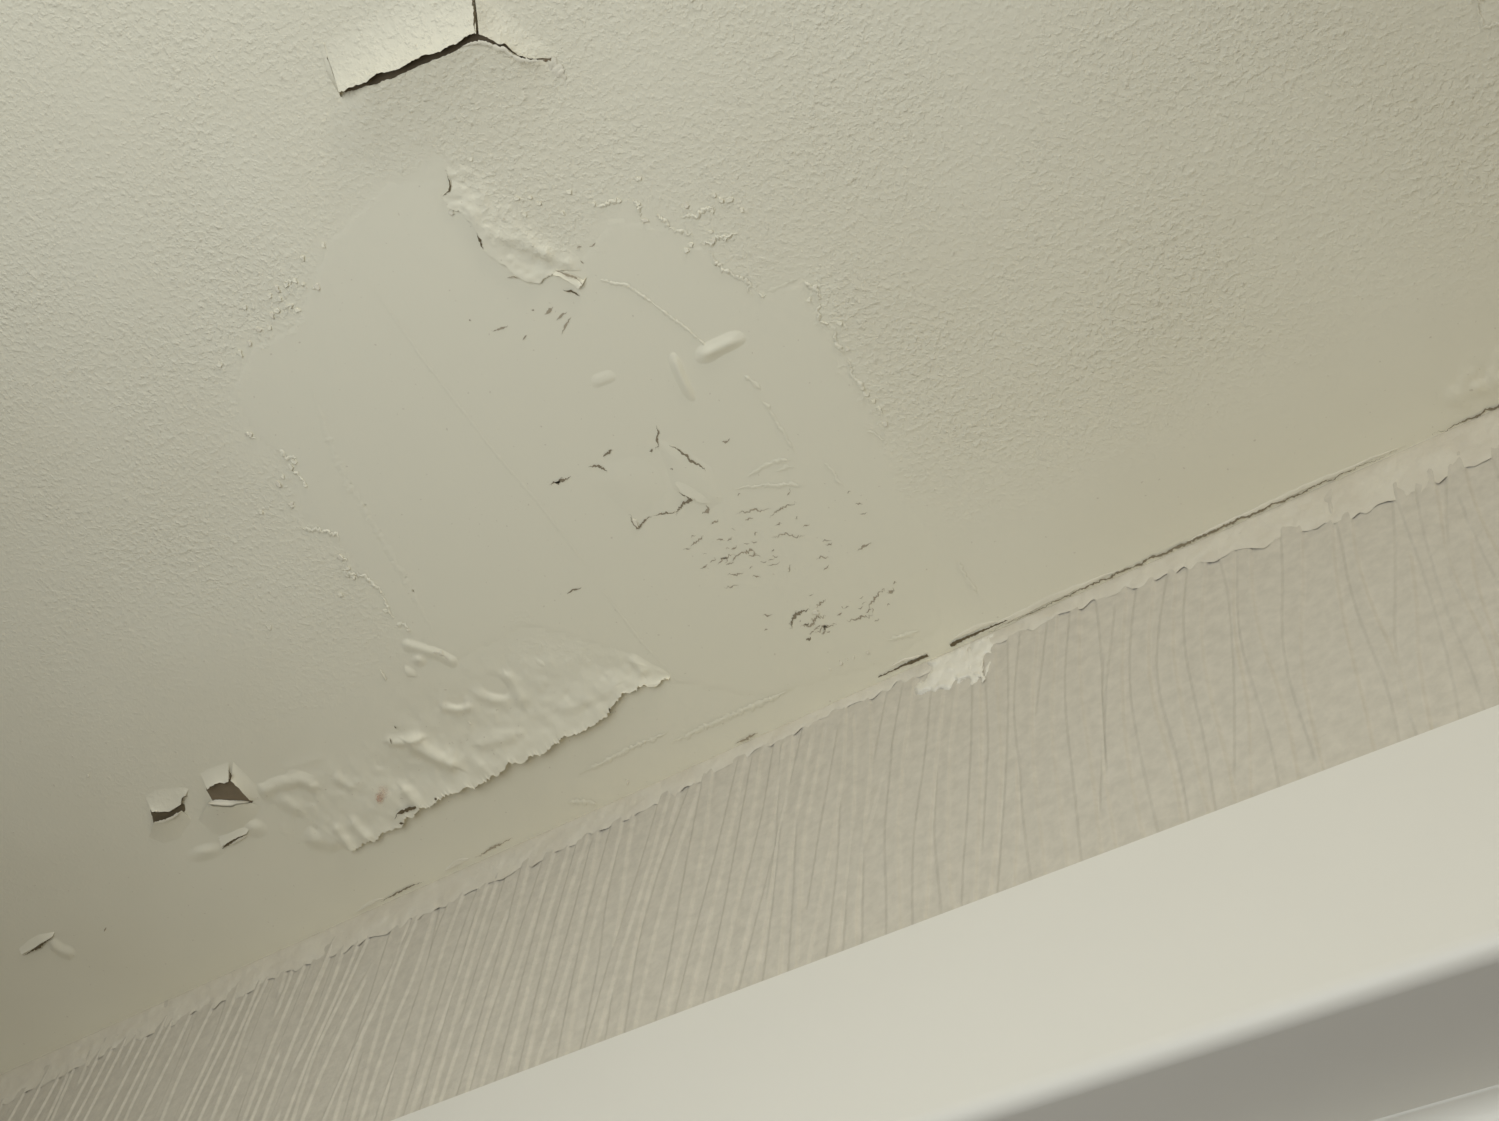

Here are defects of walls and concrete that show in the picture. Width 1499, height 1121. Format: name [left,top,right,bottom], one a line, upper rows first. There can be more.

peeling [315,0,586,296]
peeling [592,193,765,298]
peeling [650,428,723,514]
peeling [206,628,671,855]
peeling [146,787,191,843]